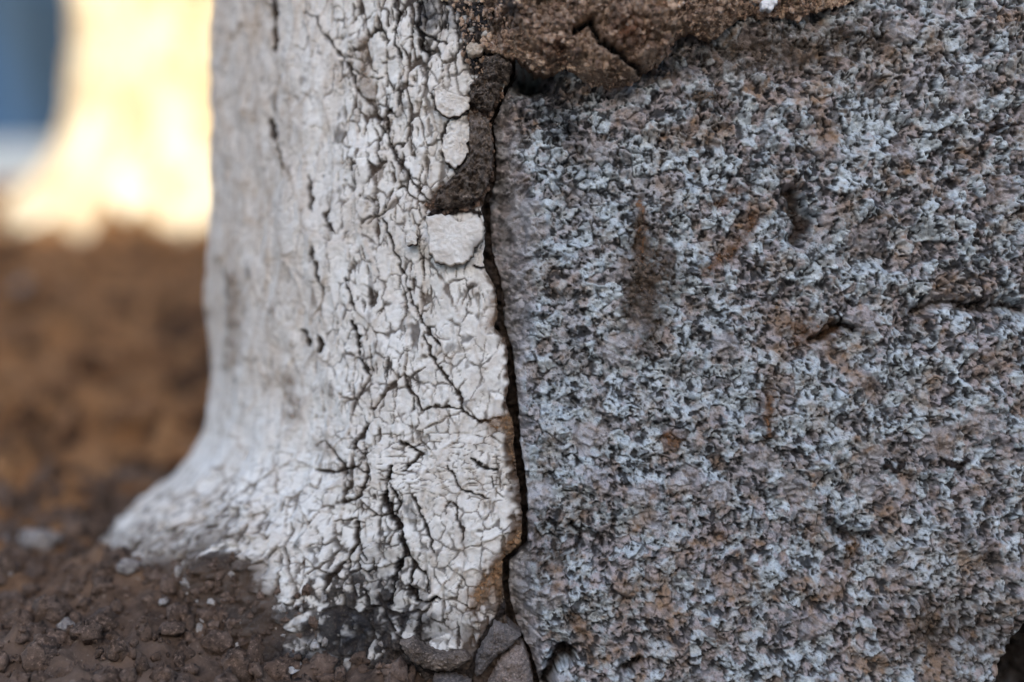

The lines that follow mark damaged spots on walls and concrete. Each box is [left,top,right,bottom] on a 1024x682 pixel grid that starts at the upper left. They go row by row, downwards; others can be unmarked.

crack [272,0,280,51]
crack [393,0,448,58]
crack [271,119,285,169]
spalling [405,0,513,267]
crack [302,330,325,353]
crack [308,13,540,682]